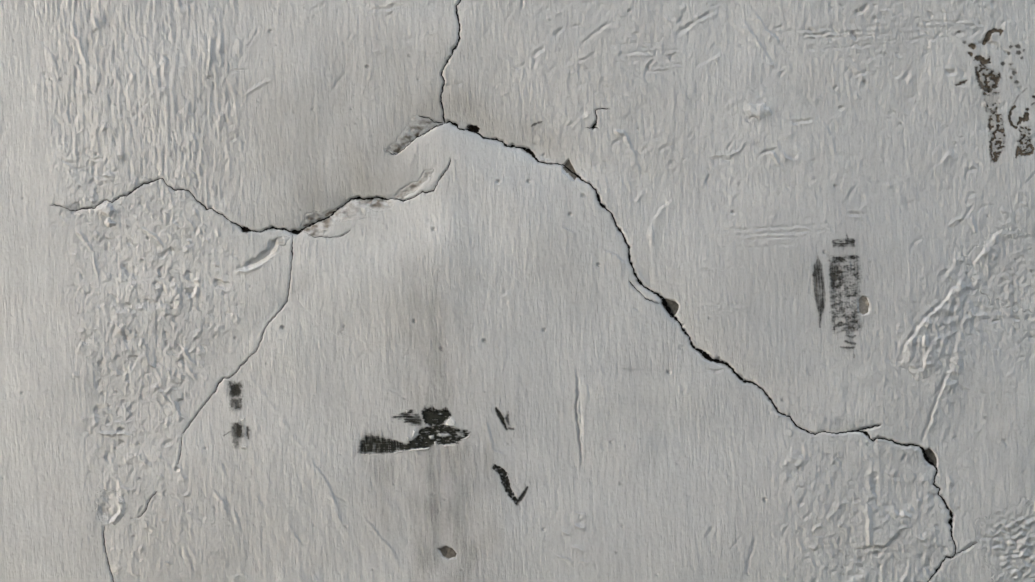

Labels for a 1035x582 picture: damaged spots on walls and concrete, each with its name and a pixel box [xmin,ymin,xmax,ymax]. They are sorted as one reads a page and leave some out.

spalling [302,169,434,238]
spalling [236,236,290,270]
crack [50,160,451,463]
crack [390,0,976,582]
peeling [812,238,869,349]
peeling [360,408,470,456]
spalling [493,465,528,505]
peeling [439,546,457,559]